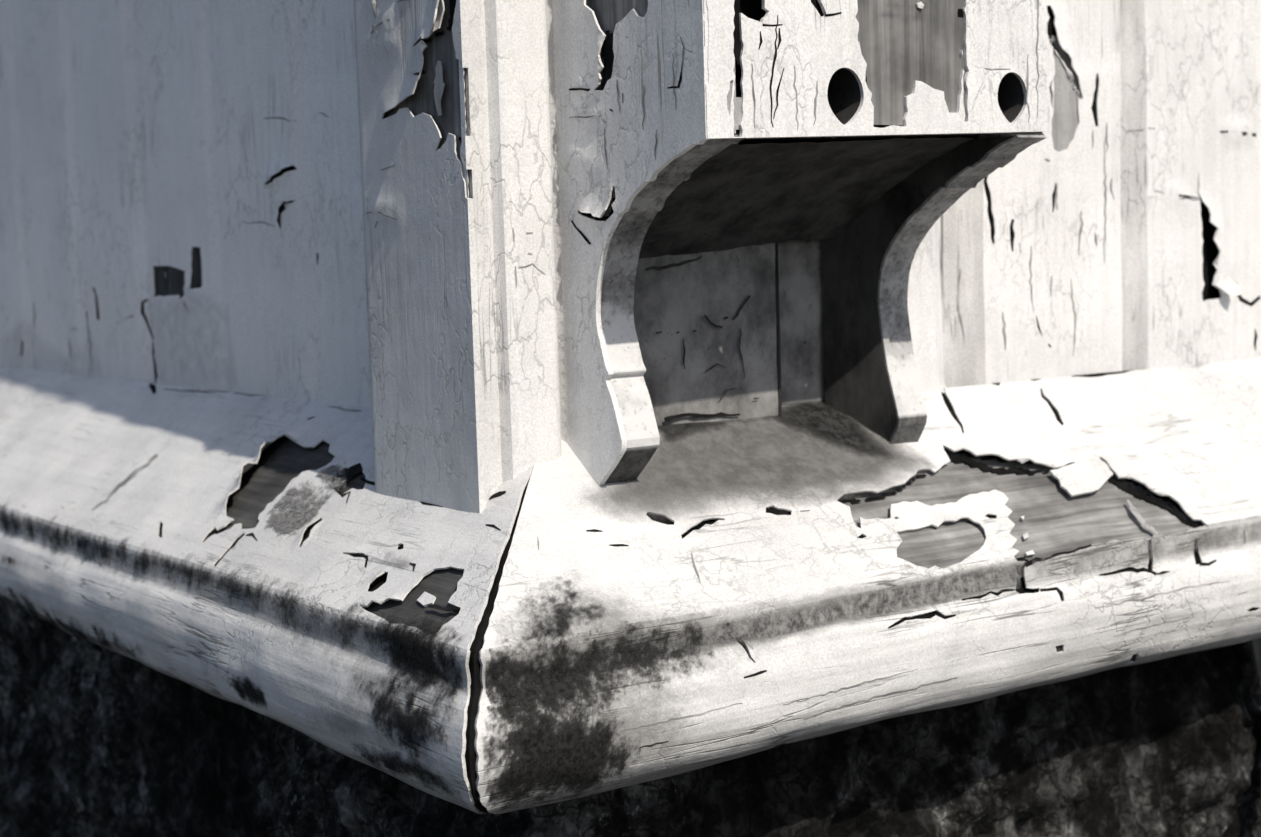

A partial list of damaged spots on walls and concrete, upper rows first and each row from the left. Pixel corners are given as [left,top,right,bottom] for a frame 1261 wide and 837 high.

peeling [383,0,470,198]
peeling [586,0,648,91]
peeling [856,0,967,125]
peeling [1179,173,1261,306]
damp [0,505,462,794]
peeling [204,438,366,565]
crack [341,463,375,485]
peeling [362,547,464,631]
crack [465,469,539,813]
crack [586,529,629,546]
damp [484,563,1021,809]
peeling [838,447,1205,568]